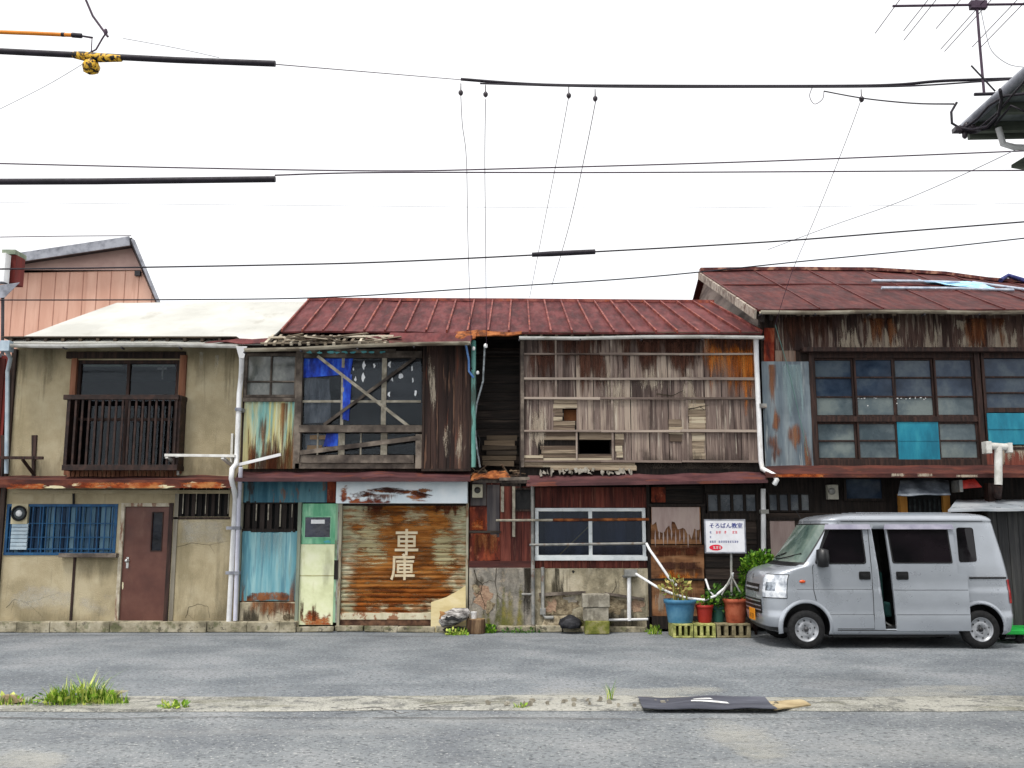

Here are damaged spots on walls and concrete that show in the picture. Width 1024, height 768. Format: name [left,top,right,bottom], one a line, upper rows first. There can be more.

leakage [527,340,607,395]
leakage [617,339,705,384]
corrosion [705,339,754,404]
leakage [783,317,832,348]
corrosion [248,403,294,469]
corrosion [769,365,824,477]
corrosion [340,485,461,613]
corrosion [241,581,295,621]